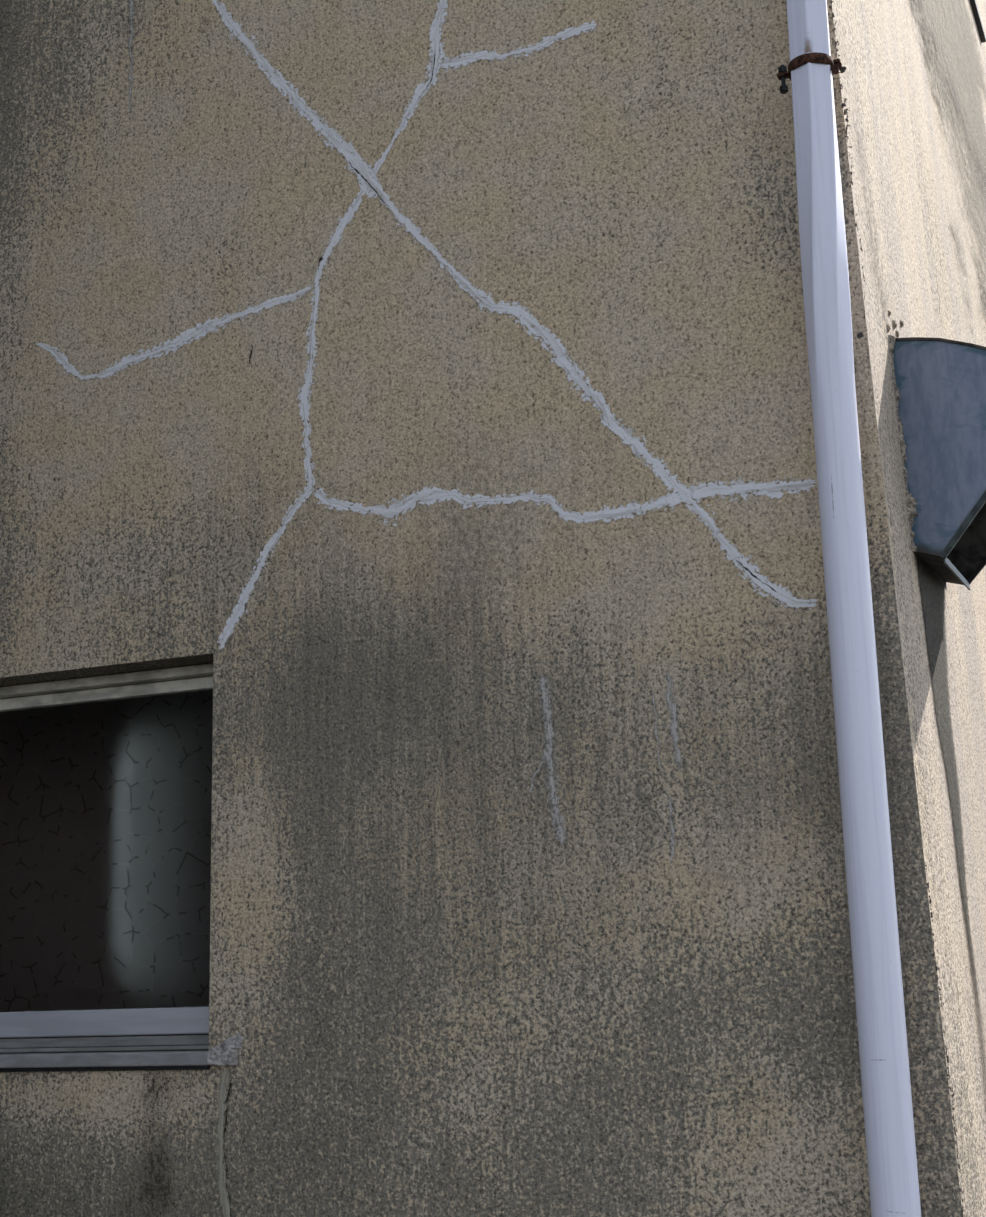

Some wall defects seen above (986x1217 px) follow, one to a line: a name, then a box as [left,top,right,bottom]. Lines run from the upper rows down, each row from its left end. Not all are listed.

crack [36,0,818,650]
water stain [909,0,986,330]
crack [217,1067,232,1217]